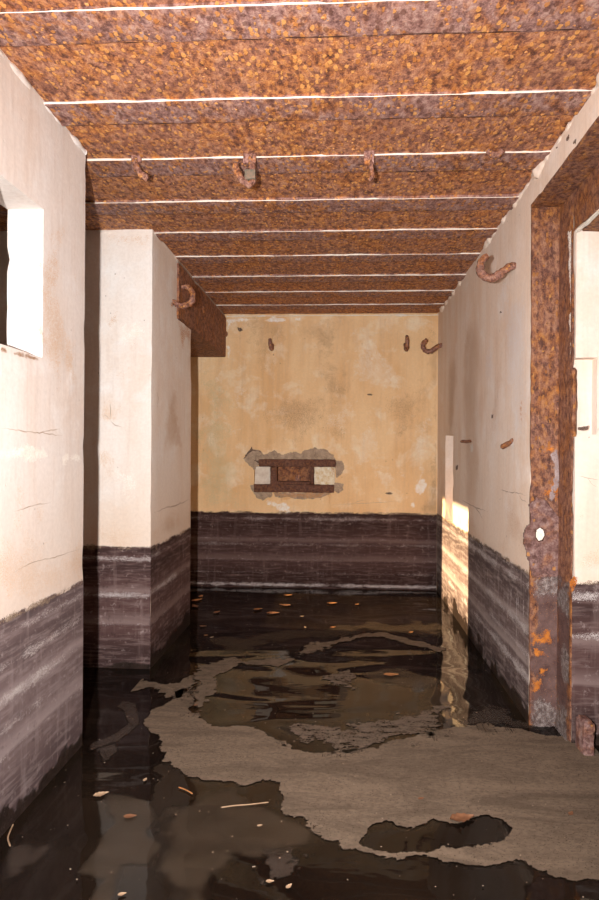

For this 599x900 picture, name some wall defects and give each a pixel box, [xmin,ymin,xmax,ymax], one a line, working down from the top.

corrosion [38,228,75,388]
crack [7,428,57,436]
spalling [243,447,344,500]
corrosion [540,443,559,501]
damp [0,282,599,837]
corrosion [531,629,552,657]